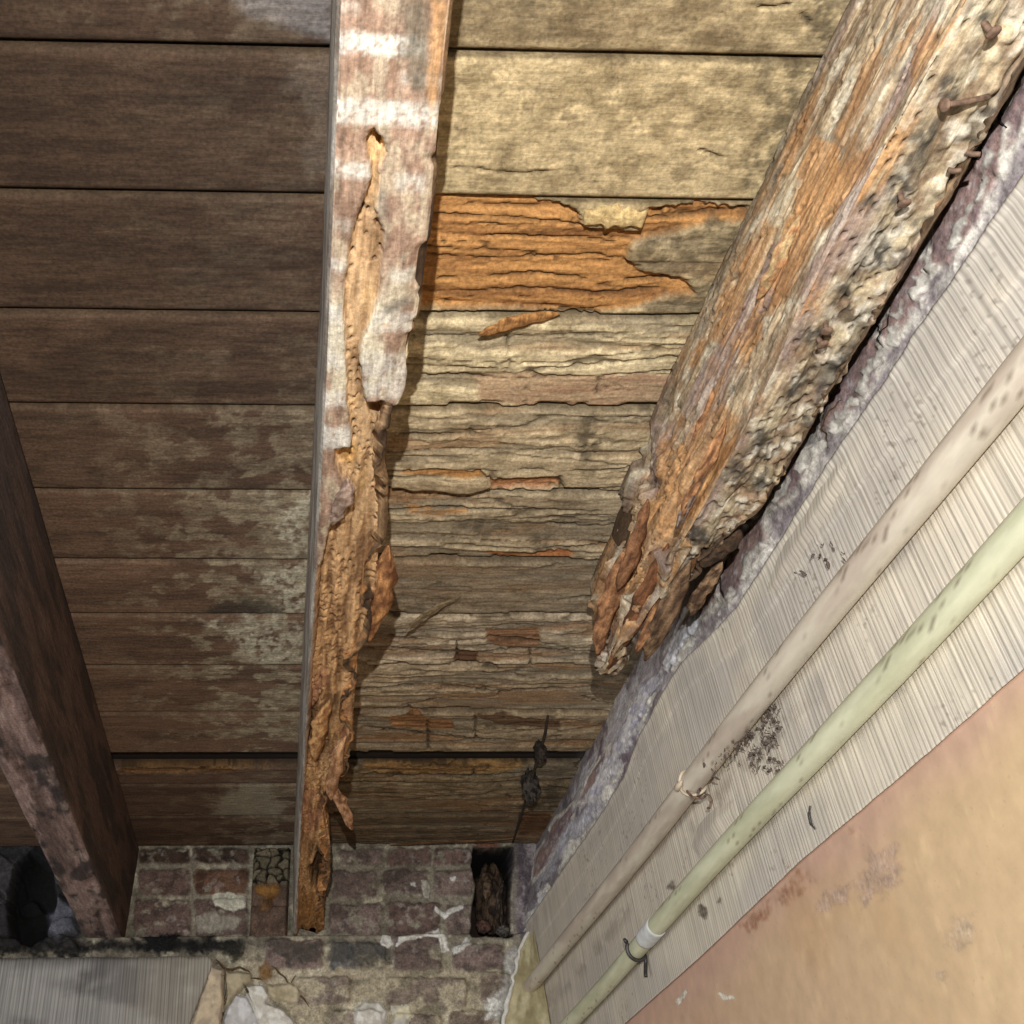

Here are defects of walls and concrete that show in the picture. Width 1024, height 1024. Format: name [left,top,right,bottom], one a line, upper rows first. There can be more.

peeling [584,203,649,231]
flaking render [946,150,994,250]
flaking render [767,261,936,516]
flaking render [718,541,767,617]
flaking render [600,764,624,803]
flaking render [192,966,301,1024]